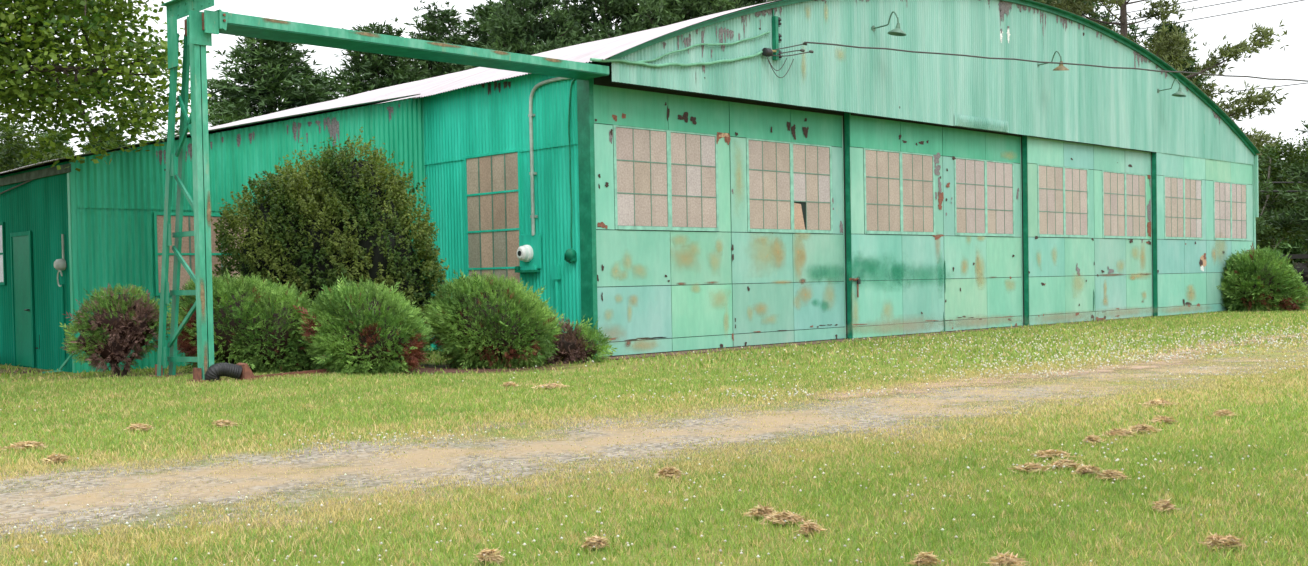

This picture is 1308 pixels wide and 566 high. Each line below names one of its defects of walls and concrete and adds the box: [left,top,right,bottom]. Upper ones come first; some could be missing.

peeling [979,0,1118,43]